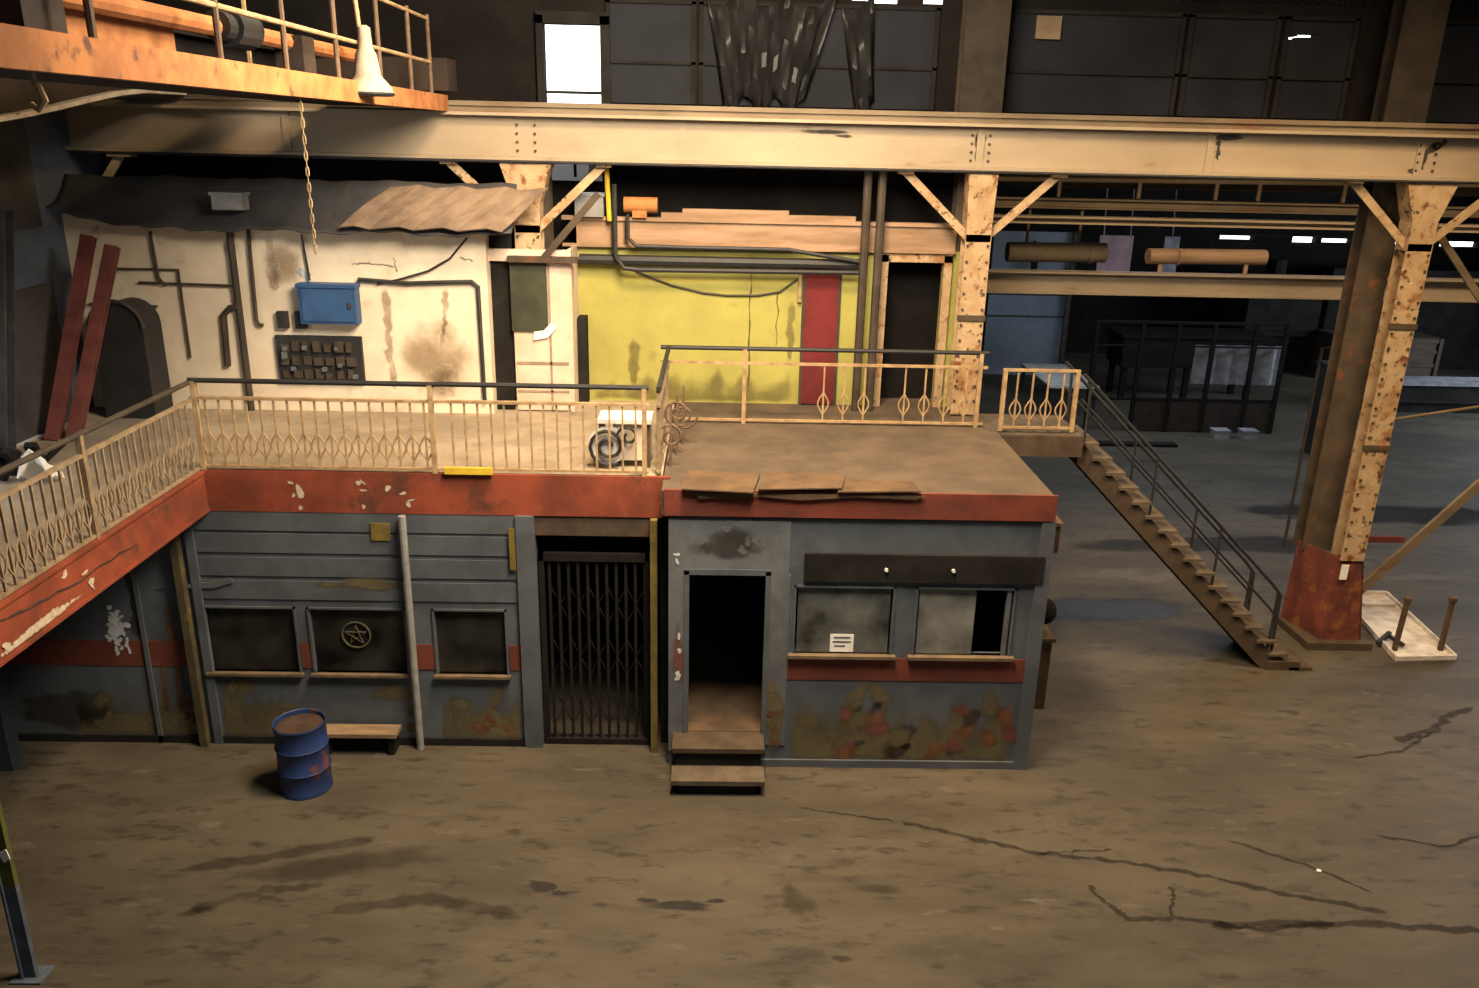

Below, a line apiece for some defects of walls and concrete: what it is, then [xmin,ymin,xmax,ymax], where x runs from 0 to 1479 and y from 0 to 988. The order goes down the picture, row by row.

peeling [288,481,304,510]
peeling [1,569,95,657]
crack [1357,707,1472,758]
crack [805,808,1479,934]